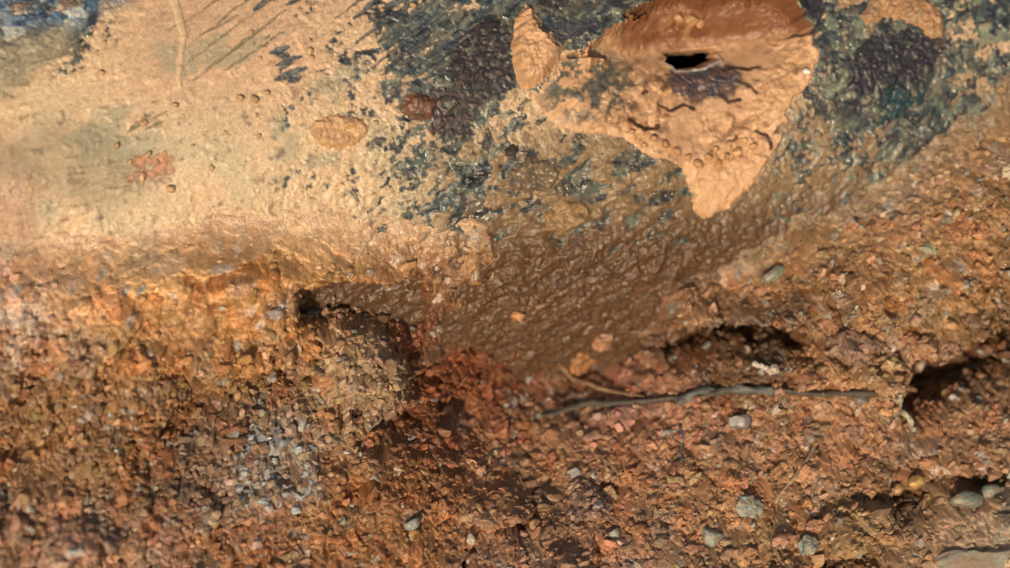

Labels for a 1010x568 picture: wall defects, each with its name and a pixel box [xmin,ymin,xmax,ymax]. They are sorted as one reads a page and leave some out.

spalling [528,0,826,219]
peeling [849,29,952,127]